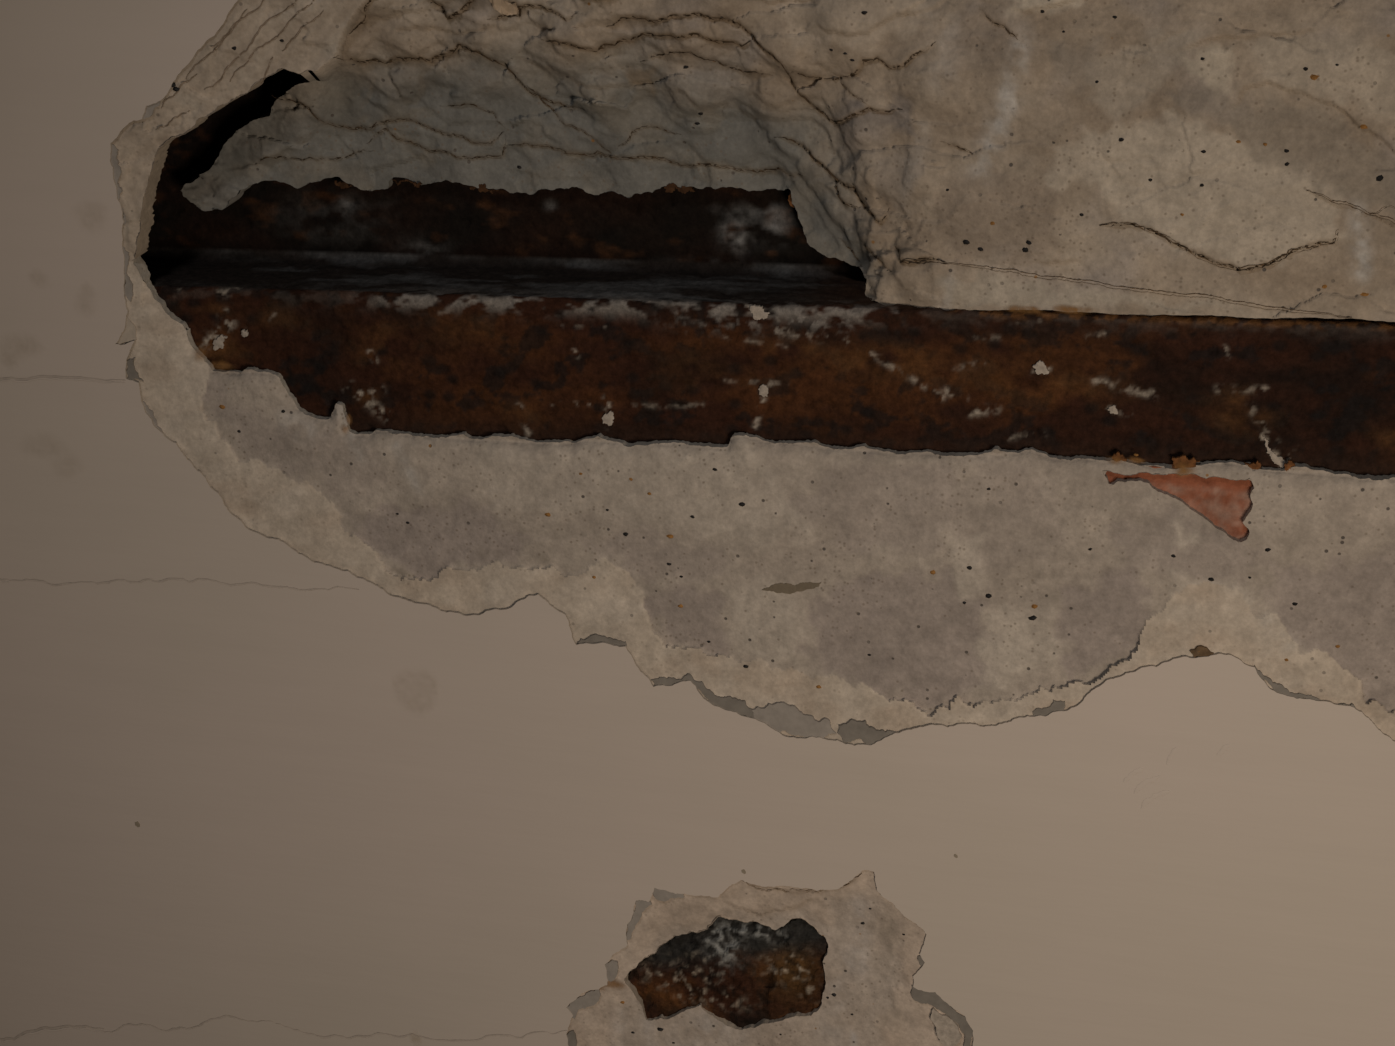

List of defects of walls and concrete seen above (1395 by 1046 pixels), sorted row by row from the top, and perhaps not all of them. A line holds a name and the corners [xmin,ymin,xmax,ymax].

spalling [111,0,1395,745]
corrosion [608,917,828,1028]
spalling [567,869,974,1046]